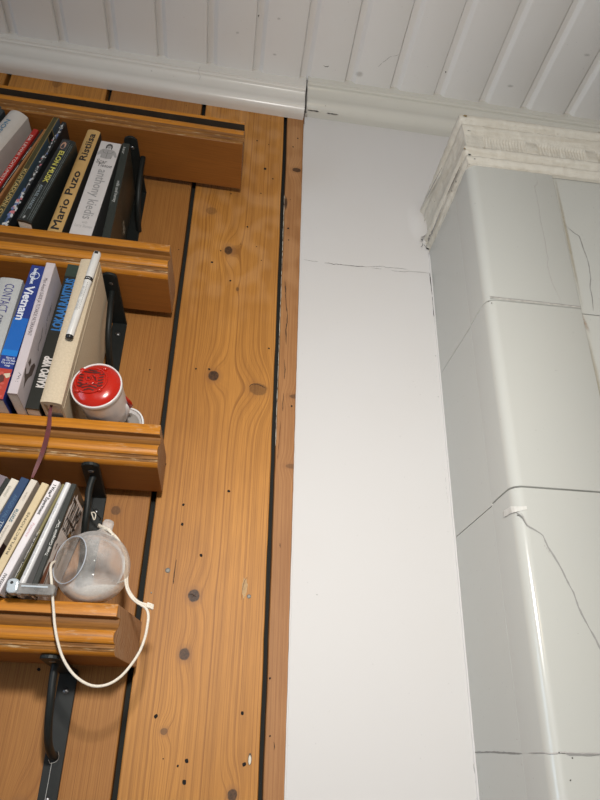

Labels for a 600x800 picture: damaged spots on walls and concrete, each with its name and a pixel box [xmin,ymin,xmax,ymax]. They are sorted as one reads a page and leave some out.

crack [308,260,434,315]
crack [564,225,593,305]
crack [516,513,600,649]
crack [473,751,600,773]